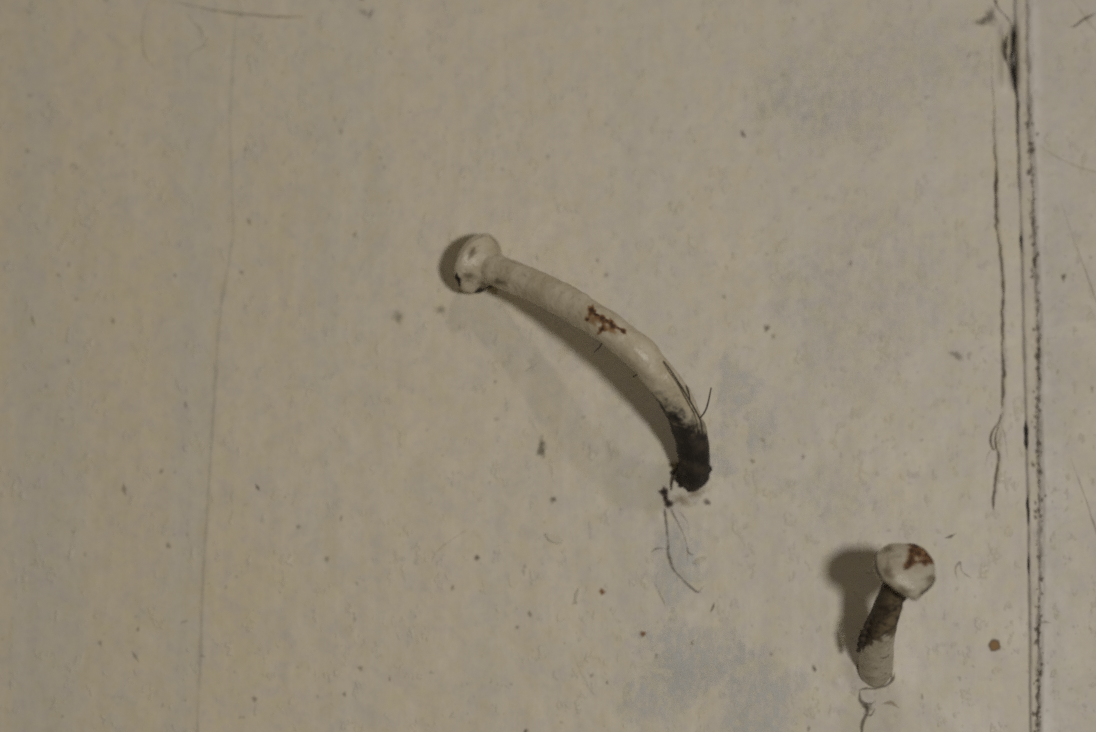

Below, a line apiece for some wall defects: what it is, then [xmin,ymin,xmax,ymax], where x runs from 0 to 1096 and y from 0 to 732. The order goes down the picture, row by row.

crack [988,0,1028,510]
rust [585,305,626,335]
crack [1024,494,1032,526]
rust [903,543,935,570]